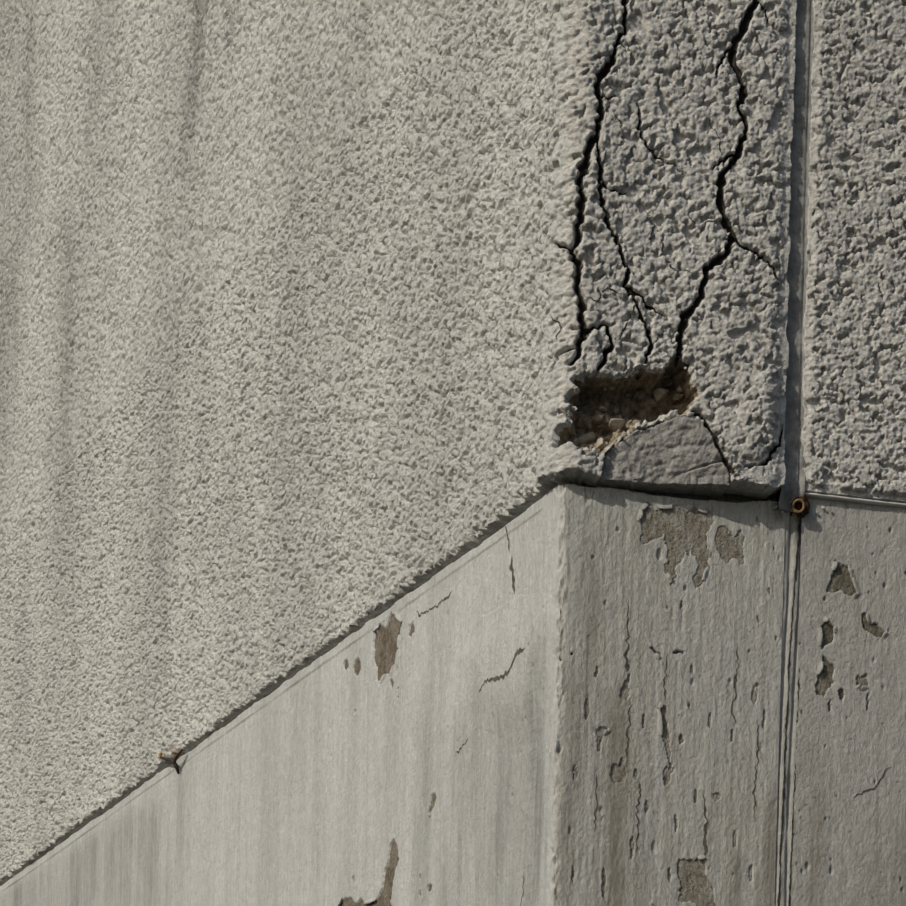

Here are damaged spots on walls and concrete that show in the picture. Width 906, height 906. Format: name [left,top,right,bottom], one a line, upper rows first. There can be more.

crack [550,0,782,371]
spalling [558,355,744,588]
crack [692,410,783,474]
crack [505,526,515,594]
peeling [826,561,861,600]
peeling [372,610,415,698]
crack [479,648,524,691]
peeling [815,616,844,712]
crack [731,645,759,818]
crack [702,794,710,856]
peeling [338,840,399,906]
peeling [668,855,716,906]